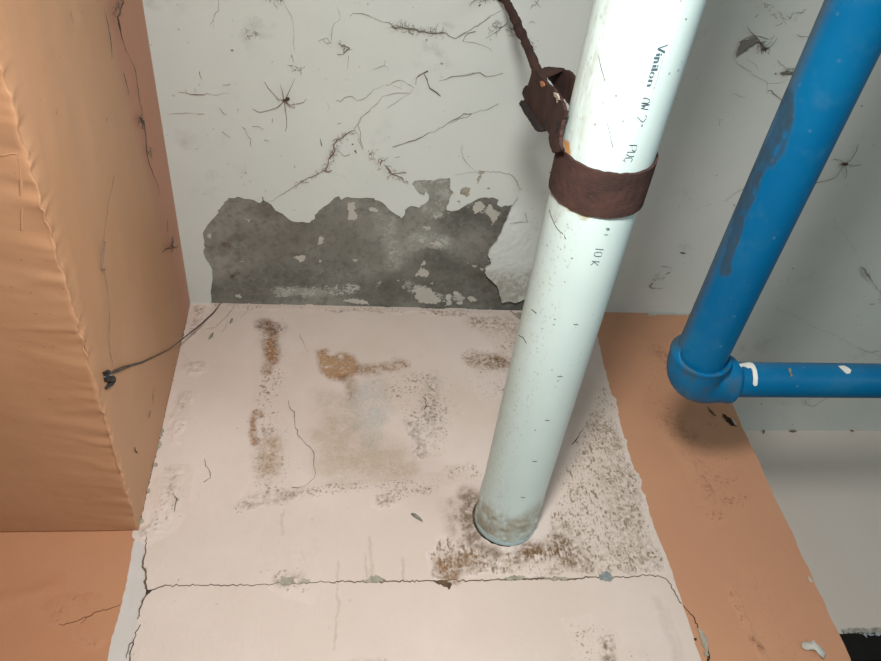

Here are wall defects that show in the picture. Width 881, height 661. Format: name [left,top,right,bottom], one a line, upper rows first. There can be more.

corrosion [259,321,278,364]
corrosion [319,350,407,379]
spalling [183,171,546,515]
crack [59,321,710,661]
water stain [461,493,497,555]